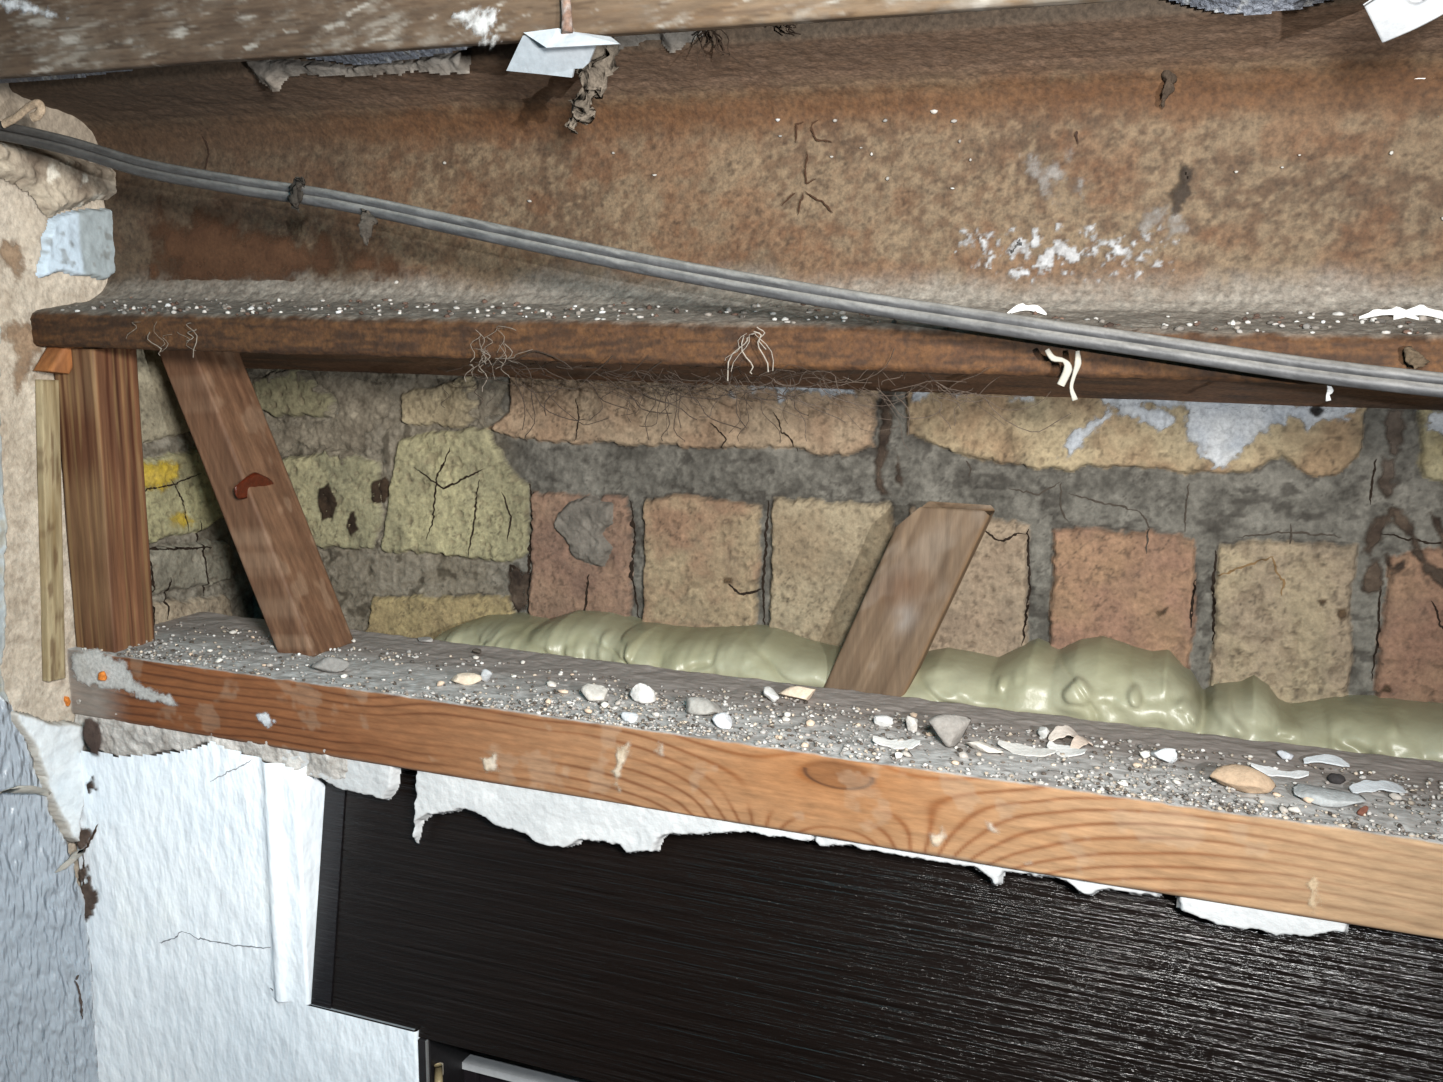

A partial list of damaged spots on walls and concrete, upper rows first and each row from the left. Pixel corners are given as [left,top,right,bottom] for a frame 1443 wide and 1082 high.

spalling [0,141,117,280]
rust [150,209,398,282]
rust [1170,166,1192,215]
damp [1064,399,1356,469]
crack [414,448,532,614]
peeling [0,417,348,873]
crack [1372,589,1382,679]